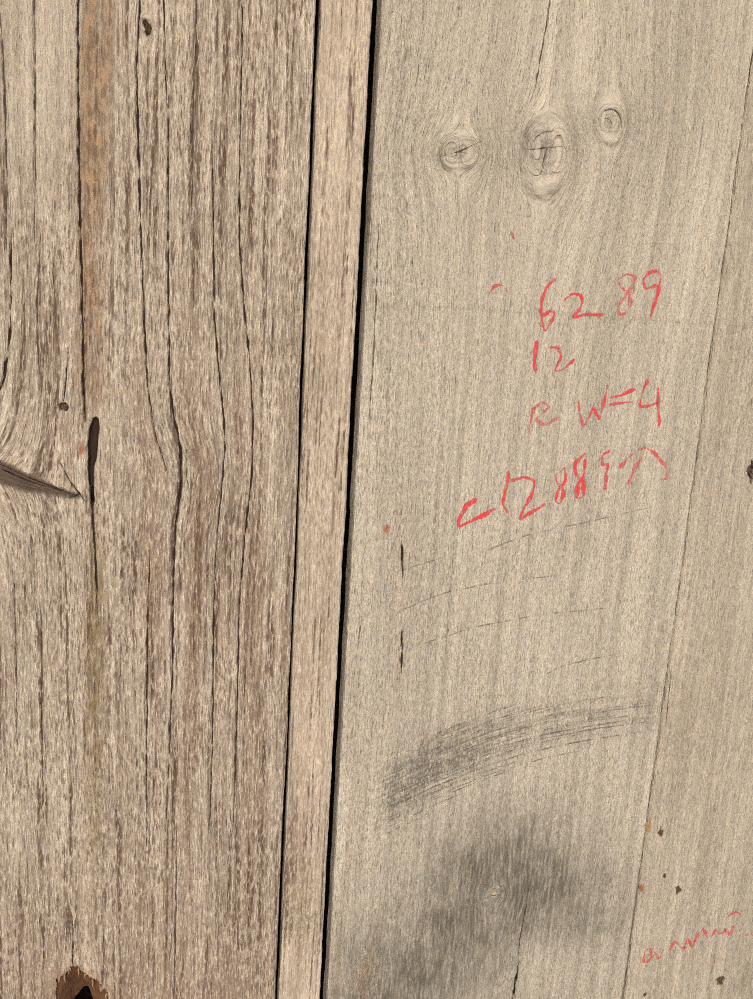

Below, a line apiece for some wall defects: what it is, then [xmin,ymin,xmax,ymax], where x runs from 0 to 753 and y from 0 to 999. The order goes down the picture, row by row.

crack [0,0,41,390]
crack [60,0,100,616]
crack [535,2,550,87]
crack [512,888,529,999]